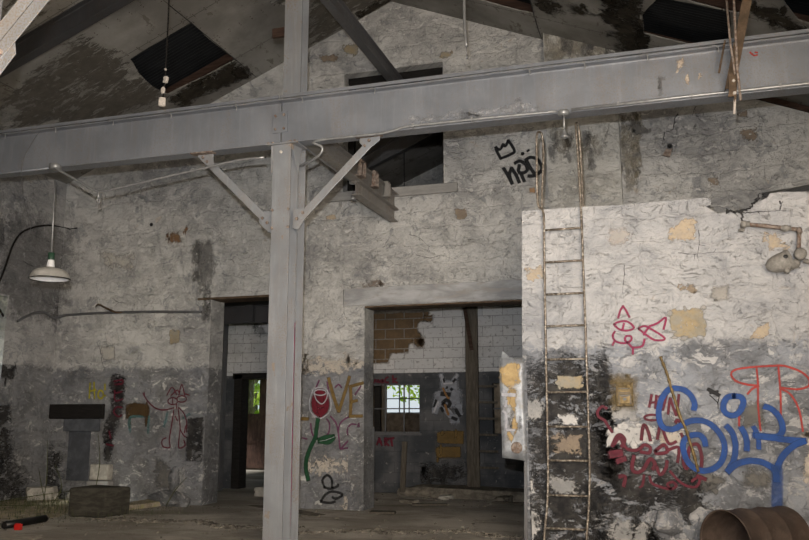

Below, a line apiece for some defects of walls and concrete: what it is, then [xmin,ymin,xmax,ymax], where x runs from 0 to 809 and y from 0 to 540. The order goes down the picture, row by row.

damp [535,0,650,56]
crack [726,193,786,221]
damp [192,240,213,321]
spalling [667,305,707,340]